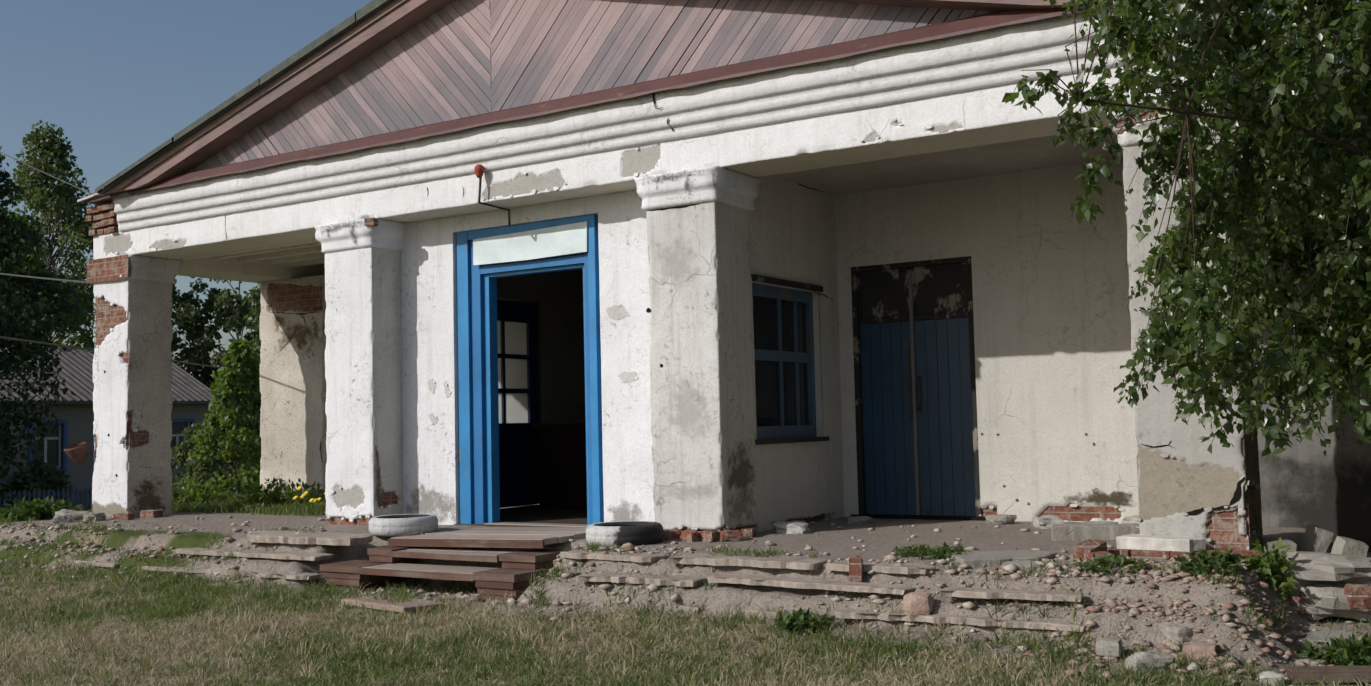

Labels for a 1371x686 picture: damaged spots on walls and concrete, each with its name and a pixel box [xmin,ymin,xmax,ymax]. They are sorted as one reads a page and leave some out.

flaking render [622,144,661,177]
flaking render [482,169,568,200]
flaking render [85,202,187,348]
flaking render [266,283,324,313]
flaking render [94,411,149,461]
flaking render [979,505,997,517]
flaking render [1003,445,1260,552]